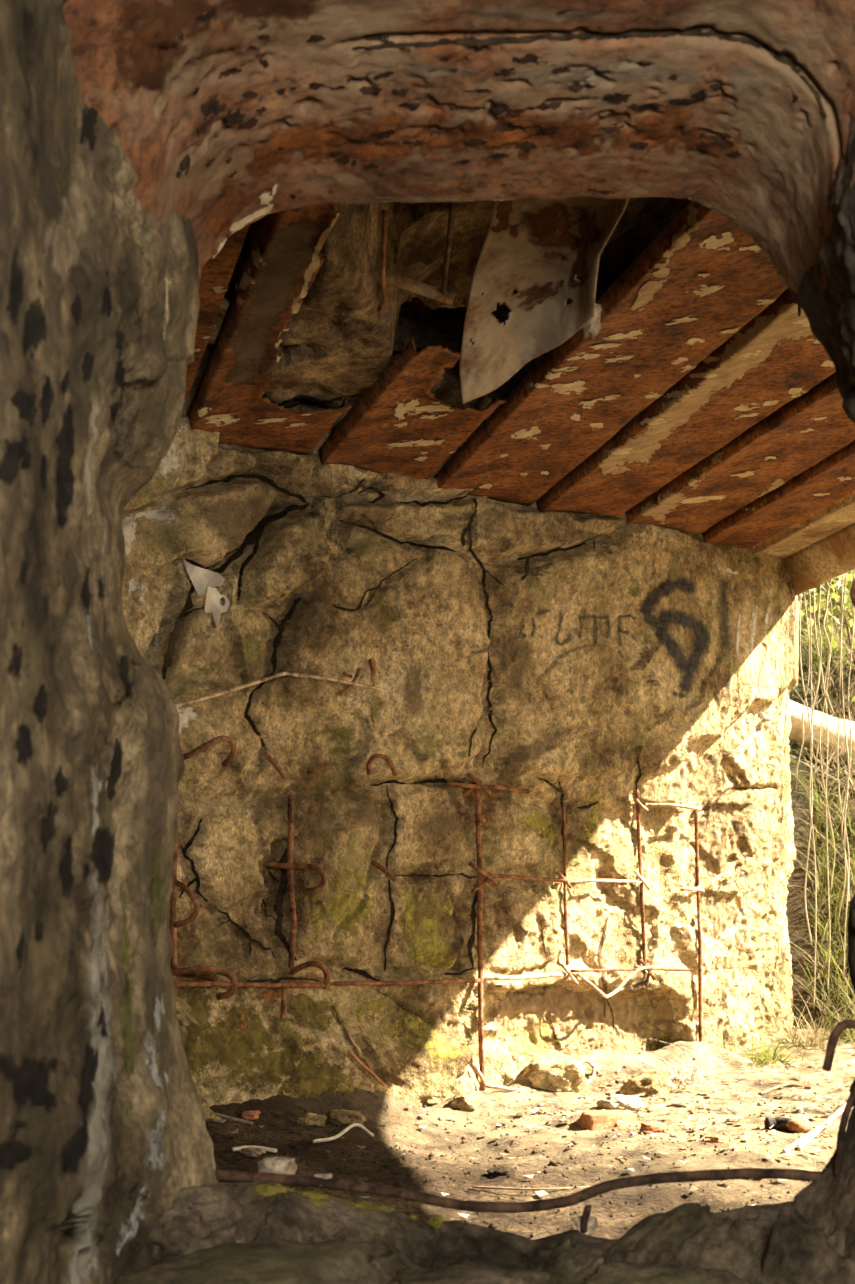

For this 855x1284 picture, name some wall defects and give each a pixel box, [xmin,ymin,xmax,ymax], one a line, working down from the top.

spalling [212,184,278,259]
corrosion [491,184,600,311]
peeling [598,199,820,478]
peeling [198,407,319,428]
peeling [387,399,455,461]
peeling [530,330,647,430]
peeling [641,447,754,524]
crack [162,474,599,1019]
crack [634,758,642,801]
crack [702,768,776,841]
crack [598,916,614,1031]
crack [334,1009,387,1082]